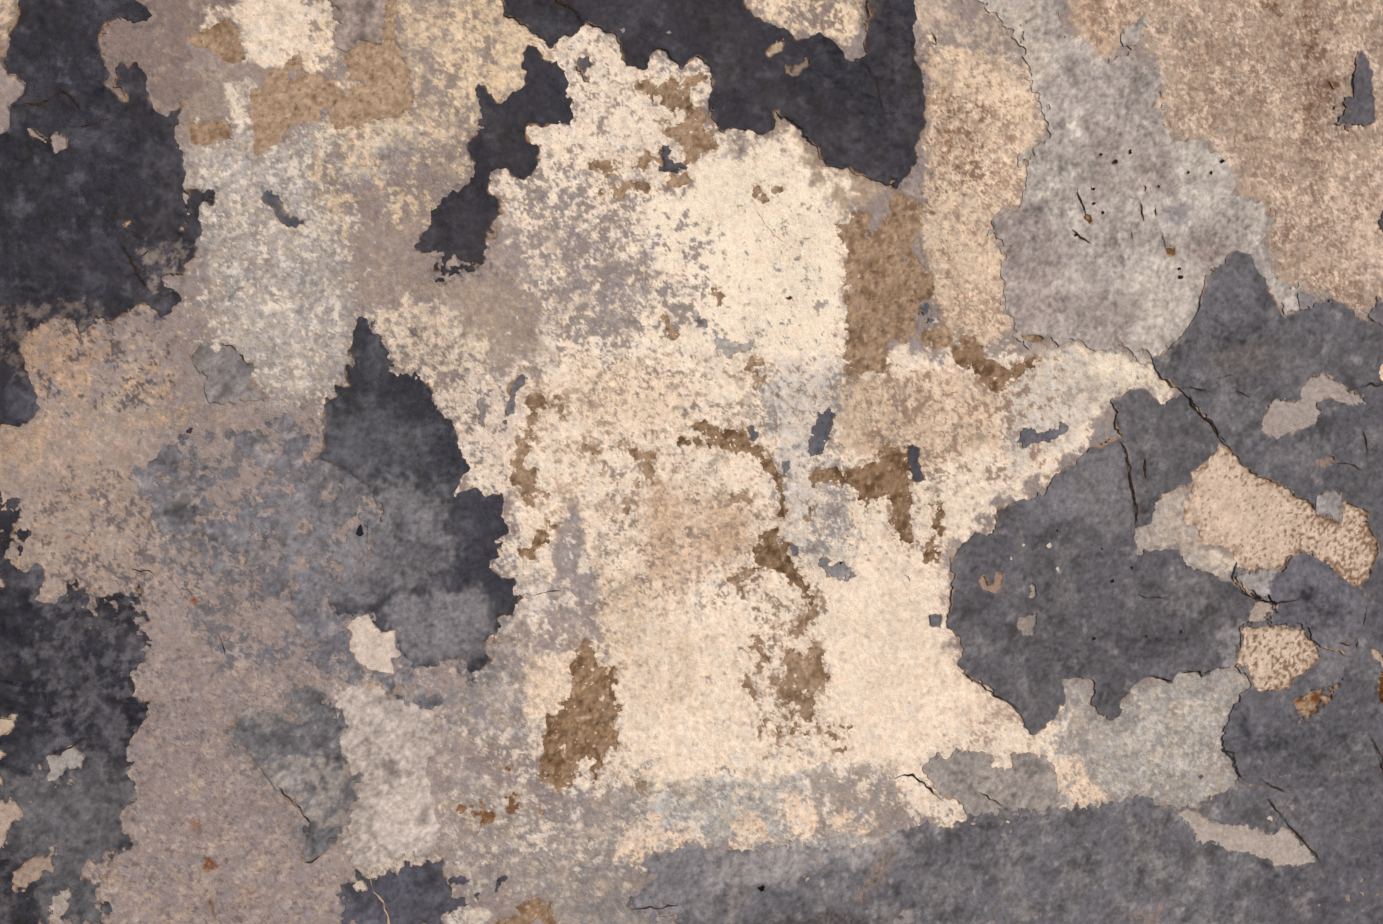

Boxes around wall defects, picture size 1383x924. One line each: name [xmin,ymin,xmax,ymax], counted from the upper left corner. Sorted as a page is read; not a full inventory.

peeling [0,0,232,426]
flaking render [187,17,245,64]
peeling [262,190,305,228]
peeling [0,491,152,924]
peeling [133,316,566,924]
peeling [414,0,1383,924]
crack [1221,748,1319,859]